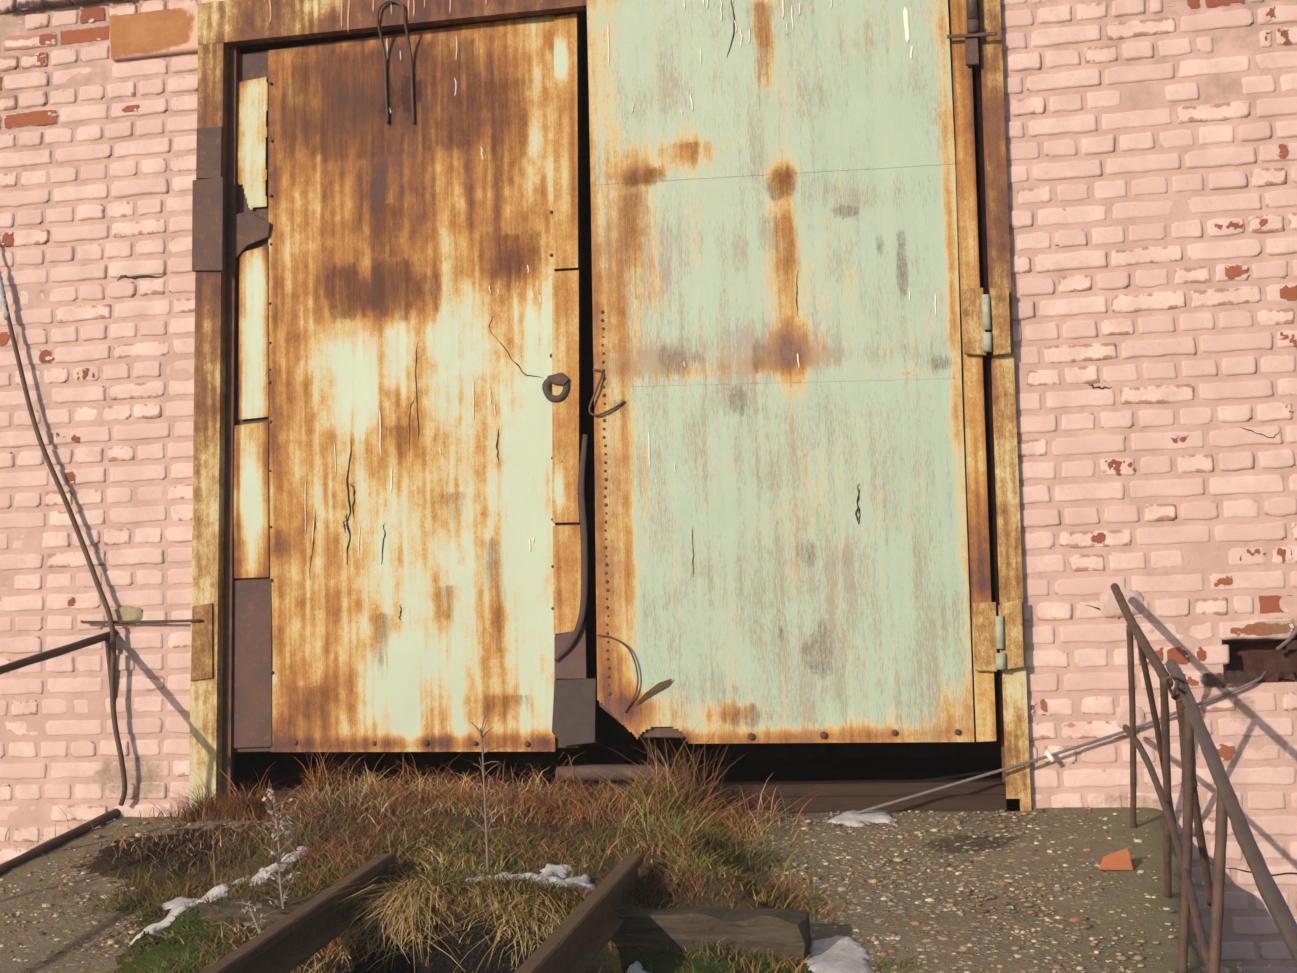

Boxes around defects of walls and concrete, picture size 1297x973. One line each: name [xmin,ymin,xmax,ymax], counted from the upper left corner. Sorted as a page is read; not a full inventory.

spalling [1168,0,1244,9]
spalling [1264,6,1292,44]
spalling [35,7,109,65]
spalling [0,110,58,128]
peeling [1215,219,1268,230]
peeling [1225,264,1249,279]
peeling [1280,282,1297,300]
peeling [1099,459,1135,475]
peeling [1240,547,1292,564]
peeling [1214,576,1233,587]
spalling [1222,595,1297,684]
spalling [1138,646,1207,686]